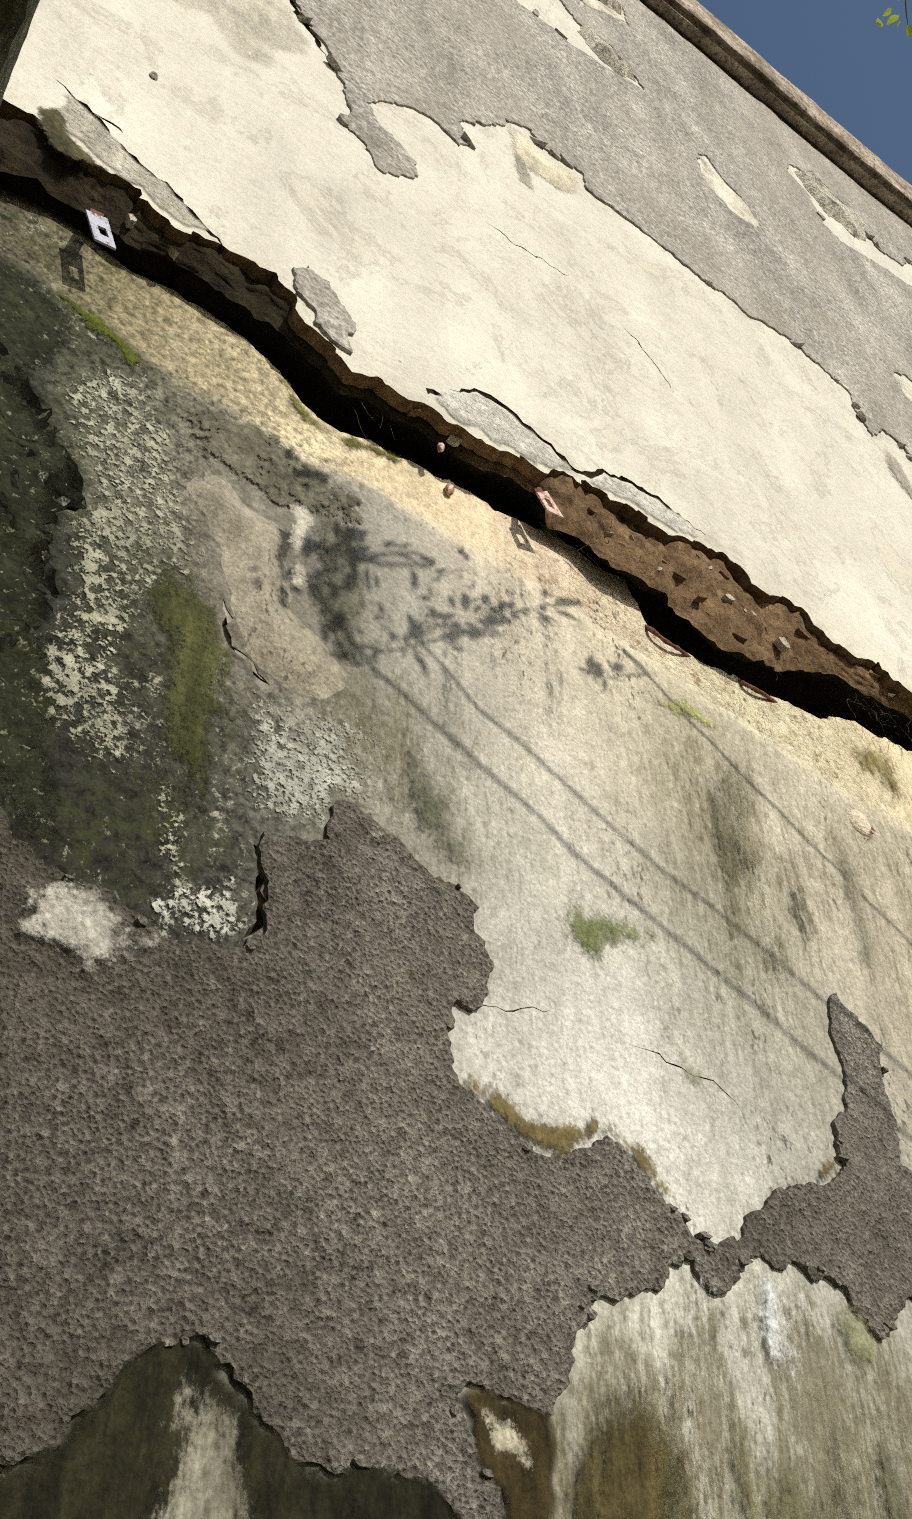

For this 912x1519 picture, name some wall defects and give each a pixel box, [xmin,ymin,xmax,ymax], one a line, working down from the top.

crack [57,80,224,252]
crack [486,222,568,276]
peeling [178,0,912,498]
spalling [0,114,912,719]
crack [426,388,705,535]
crack [222,600,270,685]
peeling [0,800,912,1519]
damp [152,1380,246,1519]
damp [569,1377,699,1519]
damp [824,1433,911,1519]